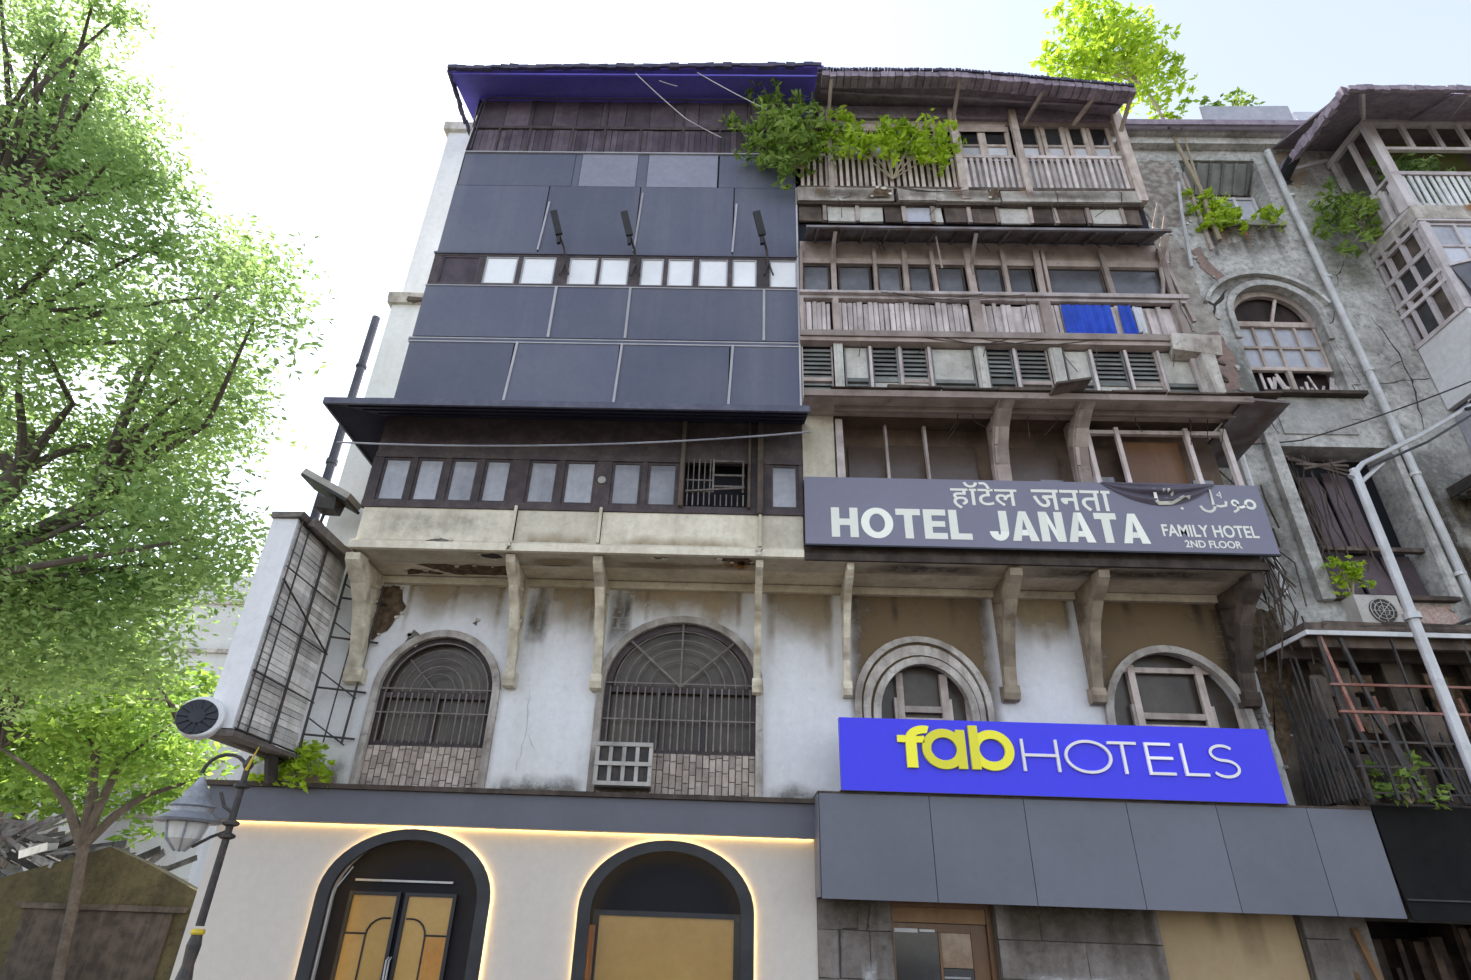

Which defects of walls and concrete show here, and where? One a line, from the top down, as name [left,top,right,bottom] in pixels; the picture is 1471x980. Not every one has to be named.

spalling [371,584,420,647]